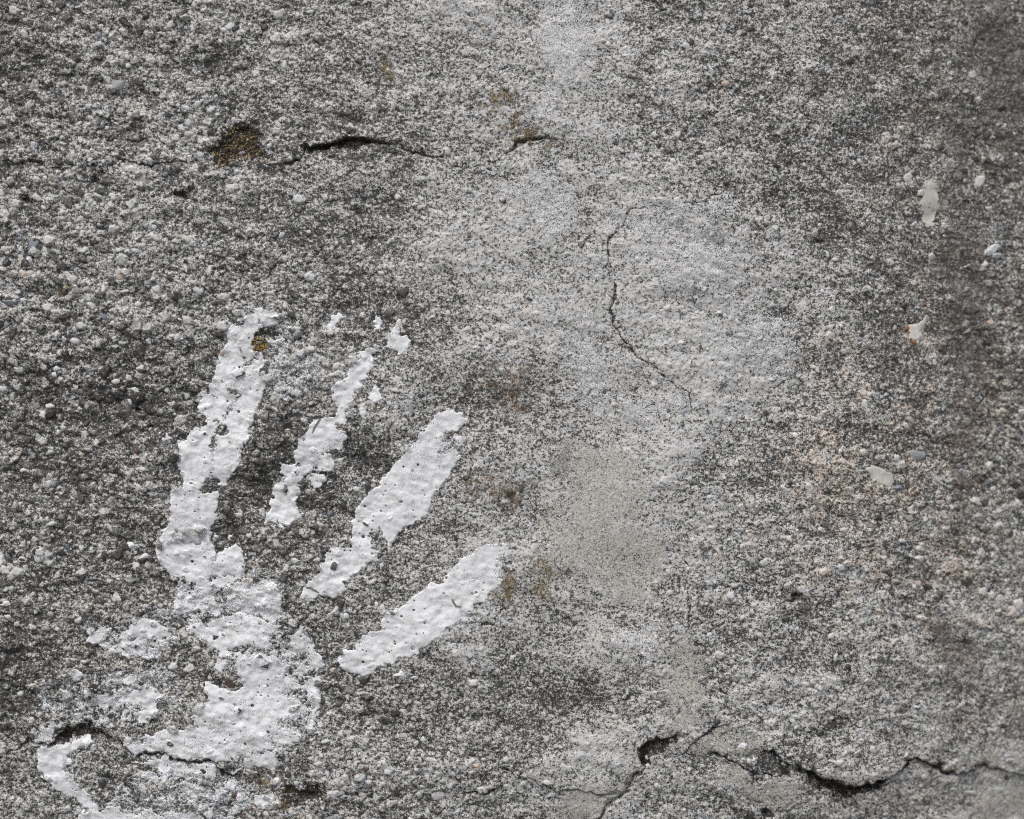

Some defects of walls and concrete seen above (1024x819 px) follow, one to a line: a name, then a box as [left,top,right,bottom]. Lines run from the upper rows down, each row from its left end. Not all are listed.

crack [269,135,549,168]
crack [567,679,1024,819]